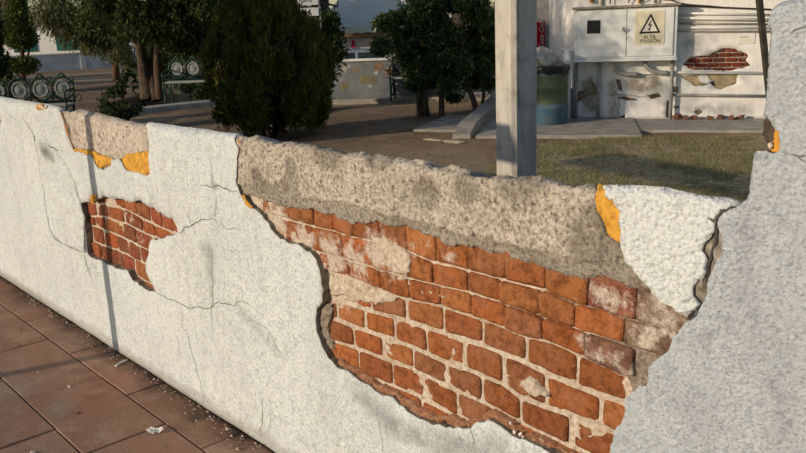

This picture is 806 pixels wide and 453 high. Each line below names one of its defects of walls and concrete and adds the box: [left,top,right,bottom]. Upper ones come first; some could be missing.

flaking render [62,109,155,175]
flaking render [648,87,679,118]
flaking render [681,48,750,89]
crack [178,161,239,234]
flaking render [86,194,177,290]
crack [162,248,285,392]
flaking render [236,135,693,453]
flaking render [695,223,723,305]